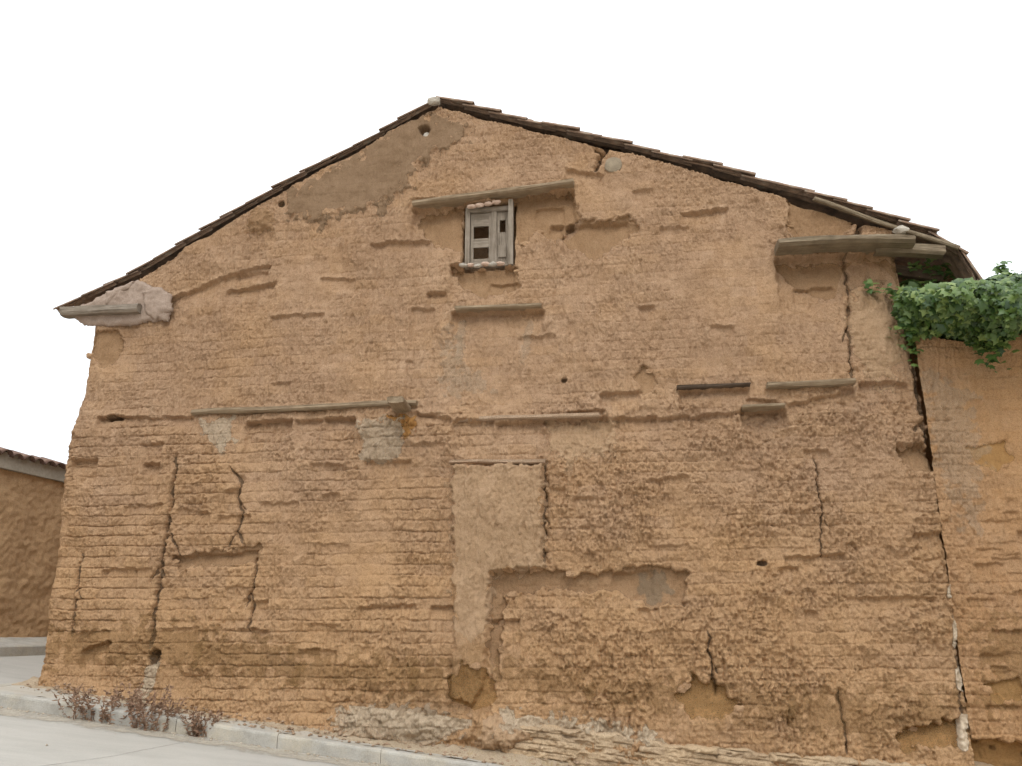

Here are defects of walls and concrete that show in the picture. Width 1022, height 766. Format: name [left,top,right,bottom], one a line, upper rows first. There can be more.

crack [842,224,859,378]
crack [910,355,926,451]
crack [149,457,181,649]
crack [229,468,246,547]
crack [246,565,258,631]
spalling [447,565,690,718]
spalling [674,674,745,719]
crack [813,460,830,557]
spalling [895,717,958,754]
crack [947,585,969,751]
spalling [971,739,1022,766]